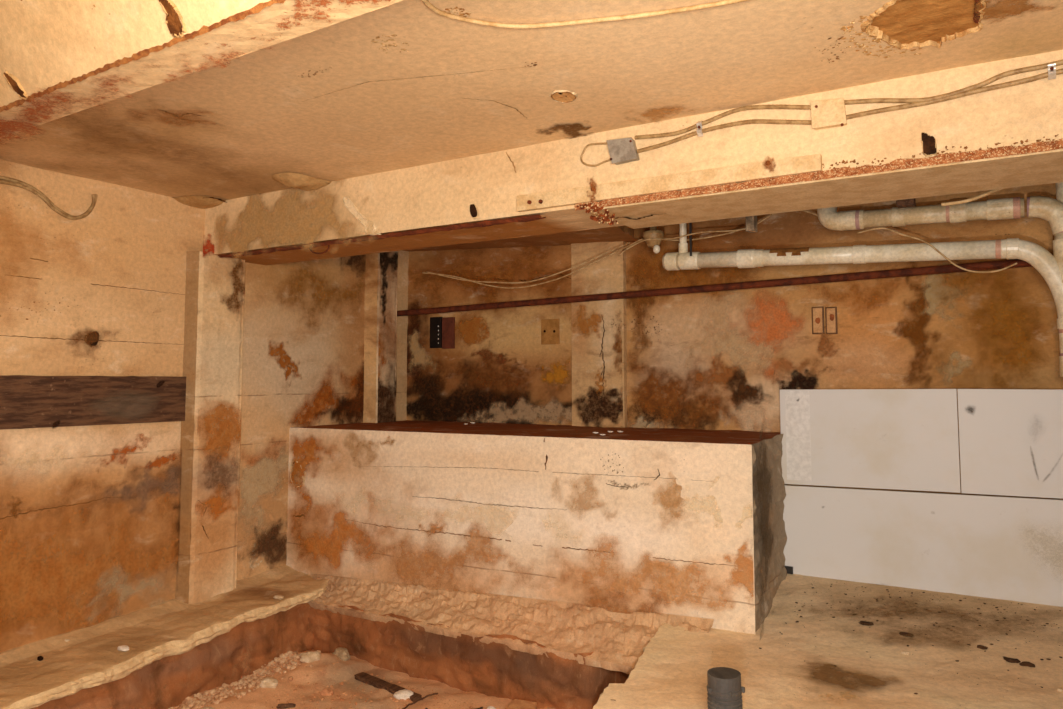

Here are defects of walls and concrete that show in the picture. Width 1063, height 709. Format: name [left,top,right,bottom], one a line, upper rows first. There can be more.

spalling [813,0,987,63]
rust [0,0,391,144]
spalling [900,132,1057,158]
spalling [576,203,618,225]
leakage [289,255,366,325]
leakage [73,331,99,348]
leakage [331,366,394,457]
leakage [377,238,818,614]
leakage [195,403,512,592]
leakage [0,463,182,630]
leakage [844,599,978,646]
leakage [809,663,898,699]